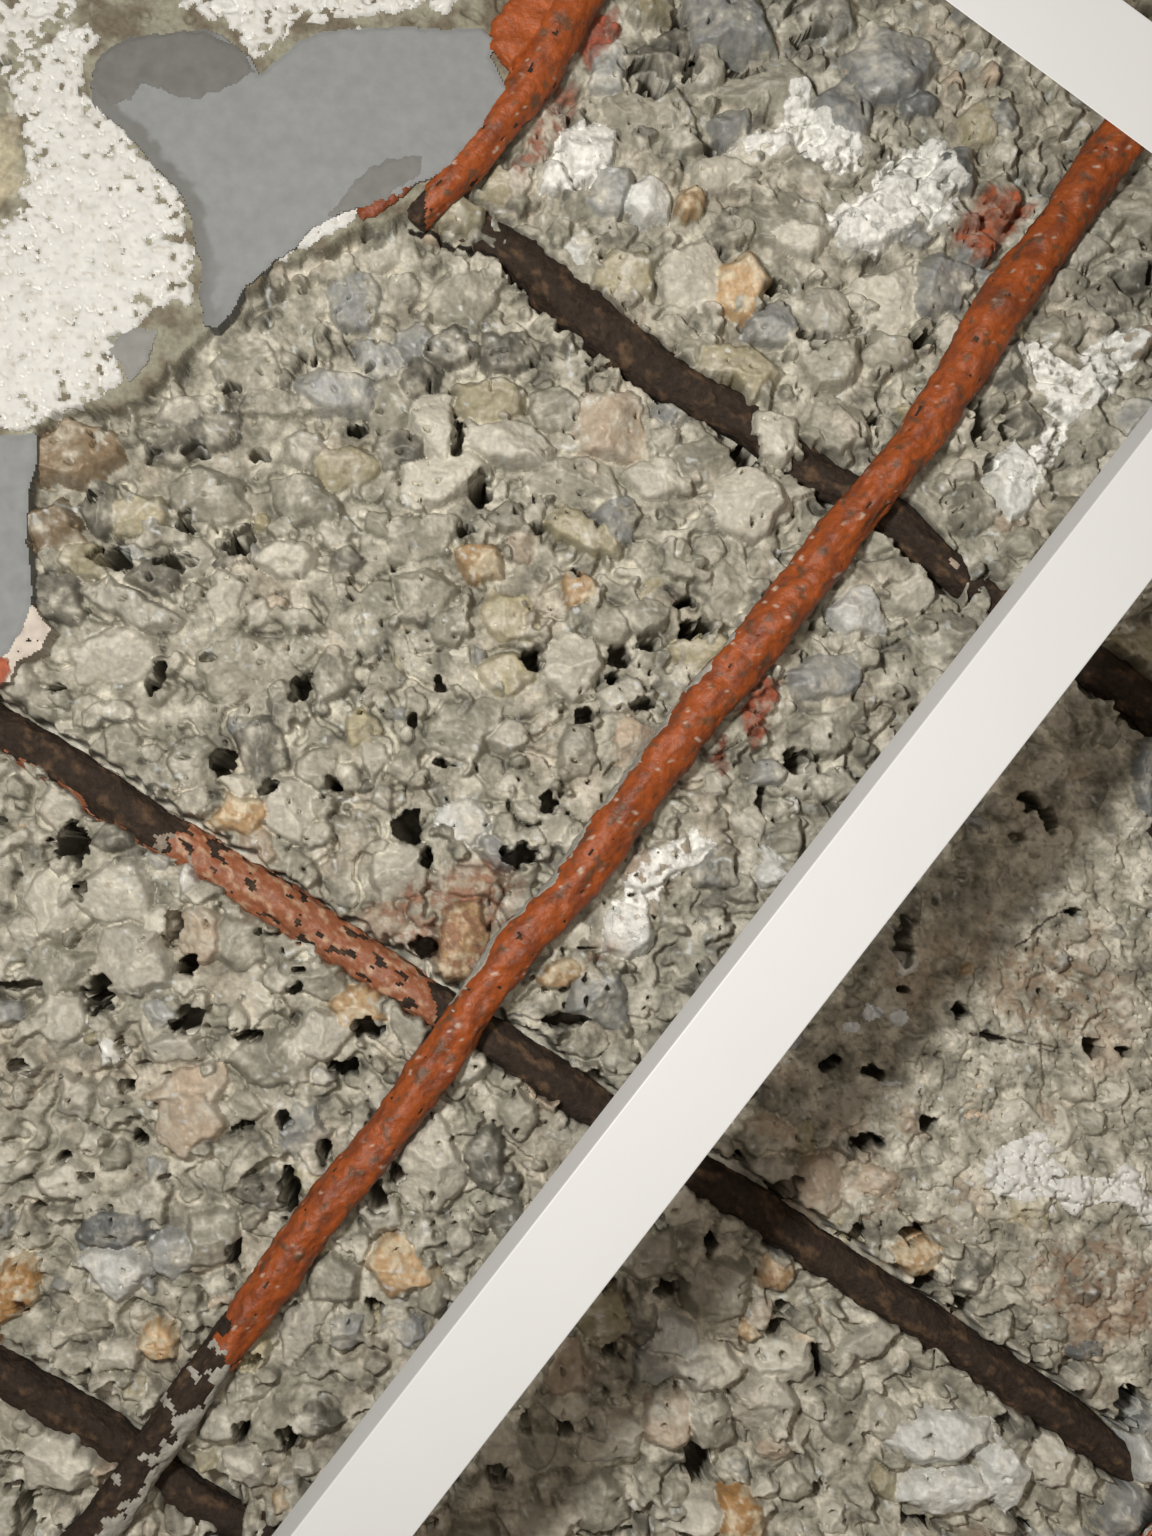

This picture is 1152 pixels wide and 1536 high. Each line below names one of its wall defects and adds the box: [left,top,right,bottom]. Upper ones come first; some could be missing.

rust [580,14,620,65]
spalling [1123,0,1152,21]
rust [514,88,574,171]
rust [956,186,1034,265]
spalling [874,149,1152,614]
spalling [0,0,1105,1027]
rust [710,735,726,774]
rust [741,677,779,749]
rust [382,861,514,979]
spalling [413,530,1152,1536]
spalling [0,751,434,1536]
spalling [154,1048,590,1536]